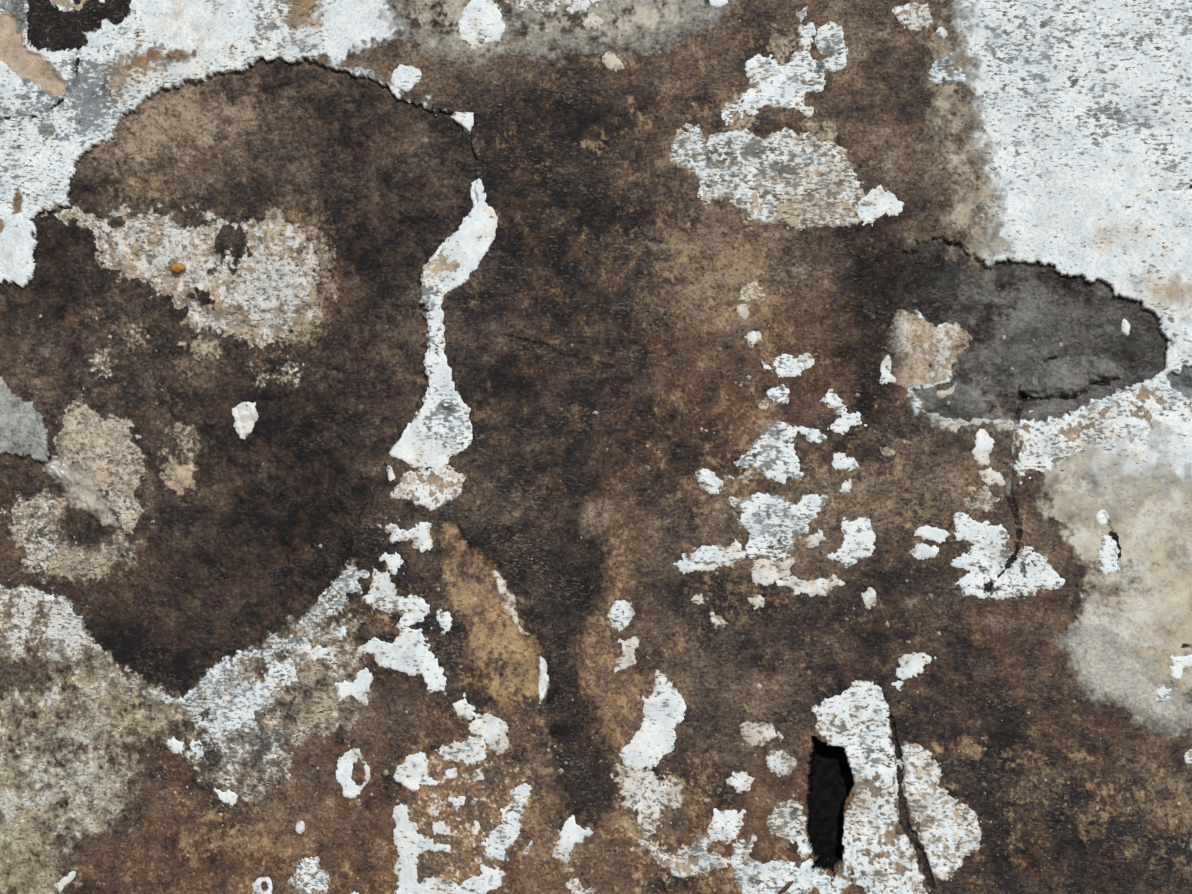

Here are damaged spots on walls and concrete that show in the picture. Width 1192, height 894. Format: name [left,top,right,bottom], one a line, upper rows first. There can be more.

water stain [393,0,471,57]
water stain [460,0,708,66]
peeling [552,815,595,894]
water stain [561,561,619,777]
peeling [673,389,877,610]
peeling [758,352,815,410]
peeling [610,652,982,894]
water stain [841,870,866,894]
crack [890,715,936,888]
spalling [880,235,1192,600]
crack [984,378,1117,592]
water stain [1033,450,1192,740]